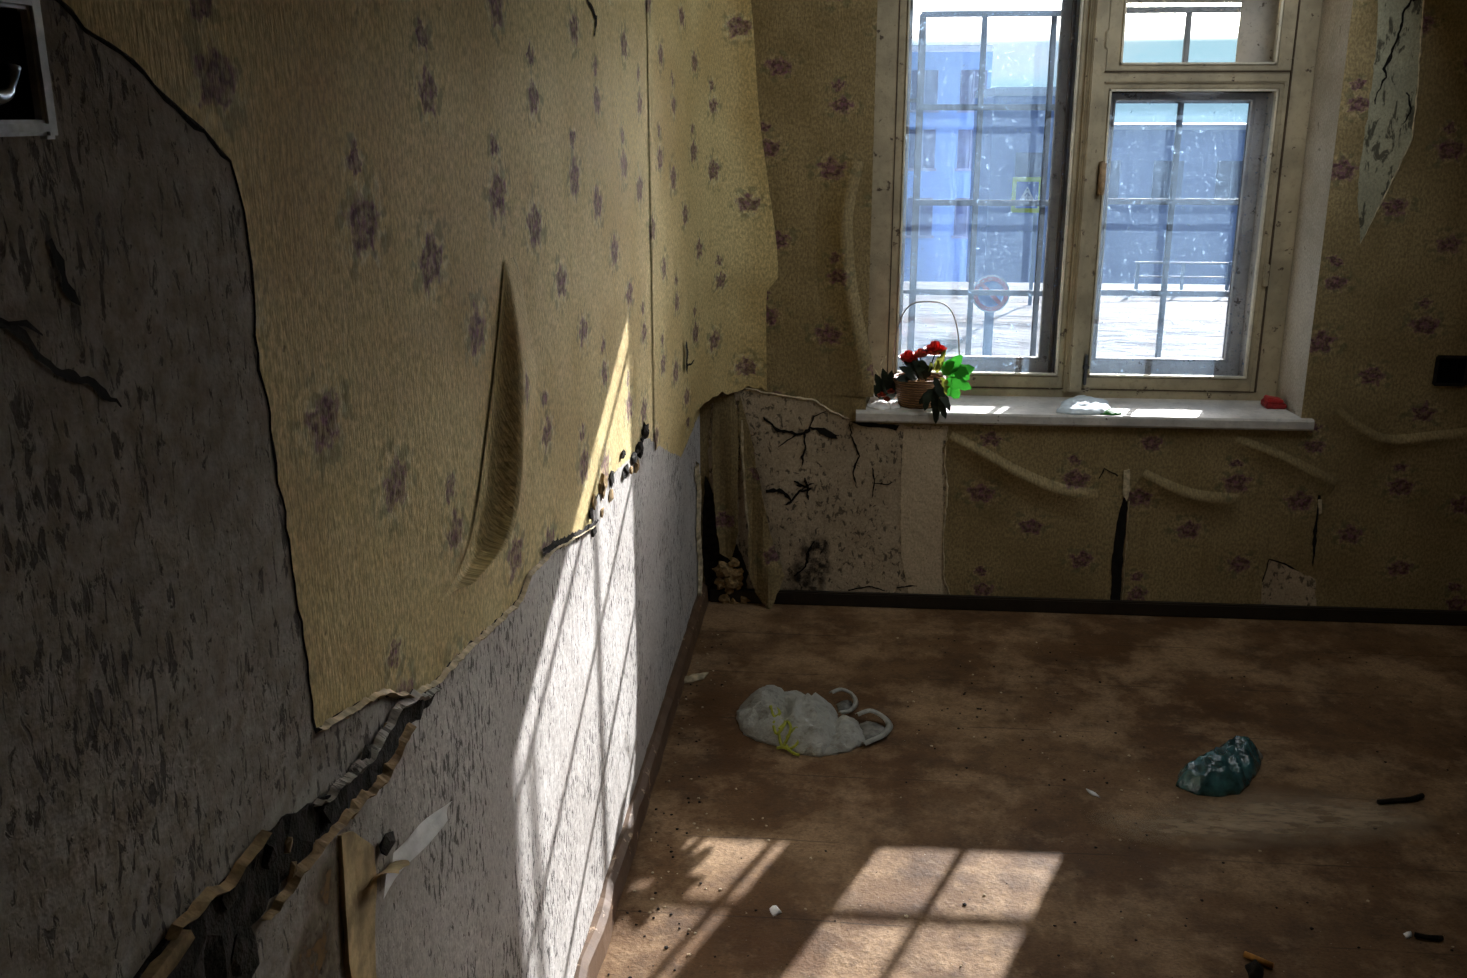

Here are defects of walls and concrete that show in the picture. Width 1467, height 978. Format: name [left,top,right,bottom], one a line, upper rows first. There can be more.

peeling [1357,0,1425,244]
peeling [0,0,950,978]
crack [763,411,895,505]